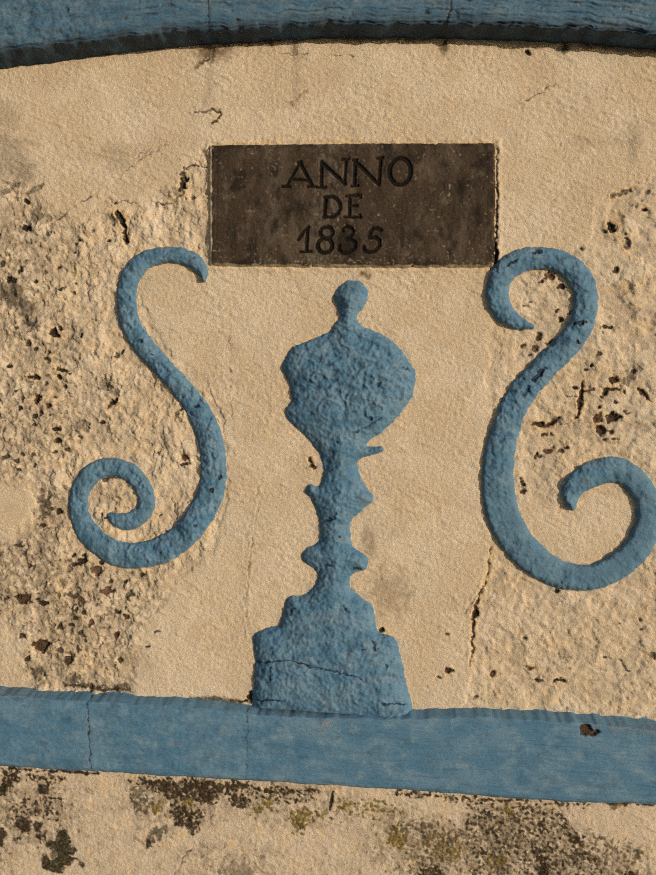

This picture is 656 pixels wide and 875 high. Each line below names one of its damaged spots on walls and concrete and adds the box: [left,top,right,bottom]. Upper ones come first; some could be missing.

spalling [109,201,129,244]
spalling [538,271,565,289]
spalling [612,266,634,297]
damp [0,283,40,330]
spalling [520,332,553,356]
spalling [593,368,641,441]
spalling [532,417,560,437]
crack [466,548,492,667]
mould [64,675,130,692]
crack [245,660,362,740]
spalling [580,724,600,736]
damp [2,766,100,776]